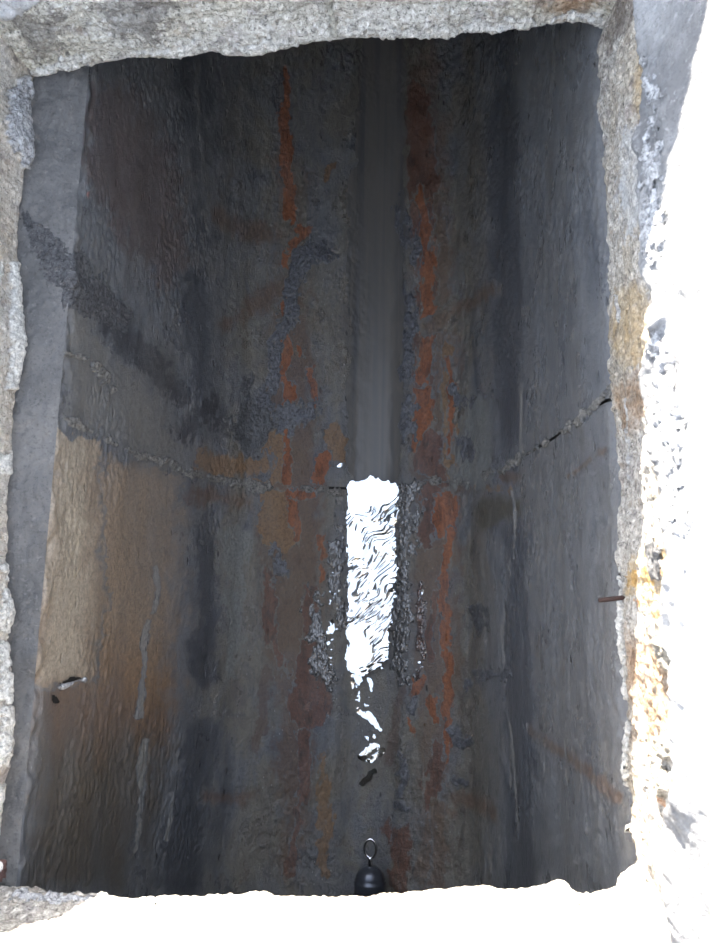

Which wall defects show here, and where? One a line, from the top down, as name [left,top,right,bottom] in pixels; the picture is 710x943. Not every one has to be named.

rust [275,64,315,269]
rust [402,38,468,297]
spalling [223,369,323,461]
rust [279,334,320,412]
rust [17,427,206,898]
spalling [299,515,353,694]
rust [250,370,474,943]
spalling [387,477,428,692]
rust [598,533,669,764]